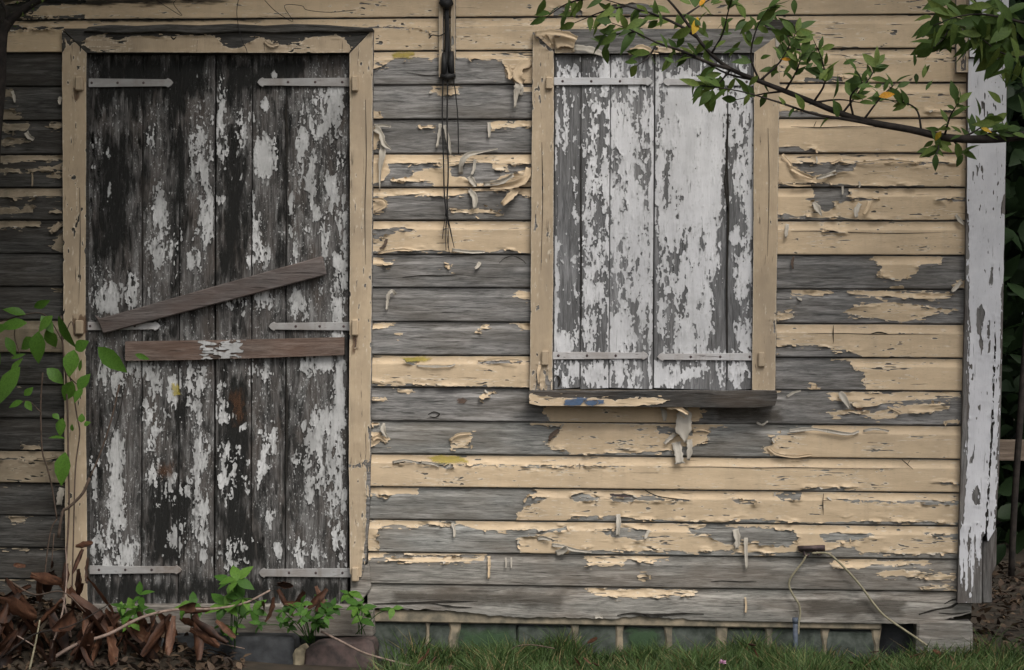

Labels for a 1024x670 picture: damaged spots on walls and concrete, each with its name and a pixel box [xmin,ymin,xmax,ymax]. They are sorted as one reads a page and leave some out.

peeling [0,1,433,320]
peeling [88,28,1004,624]